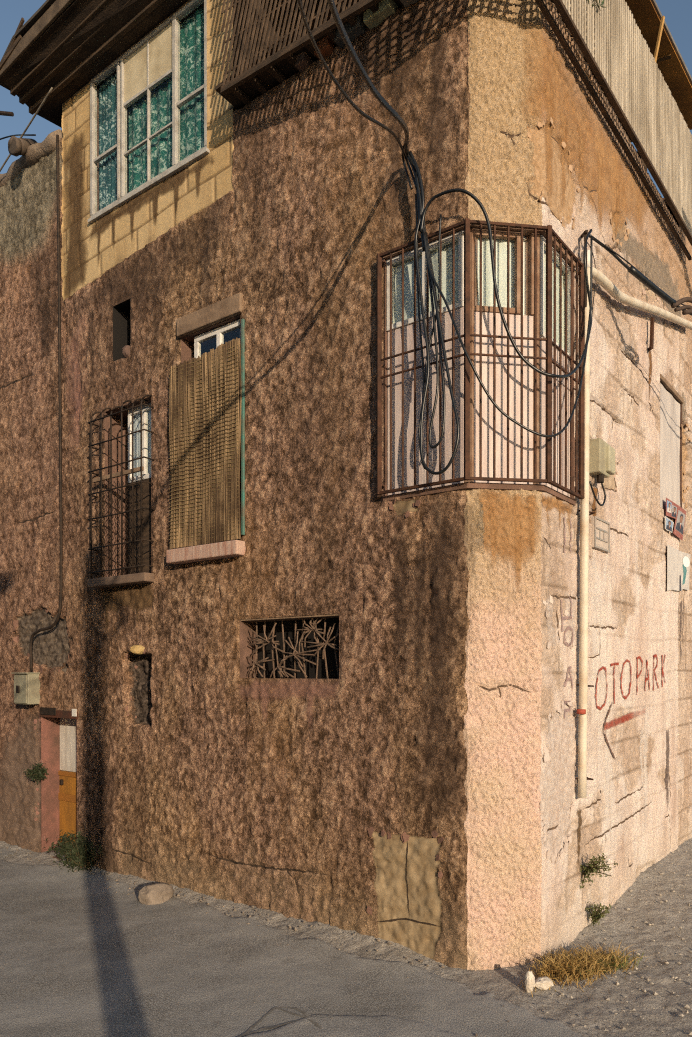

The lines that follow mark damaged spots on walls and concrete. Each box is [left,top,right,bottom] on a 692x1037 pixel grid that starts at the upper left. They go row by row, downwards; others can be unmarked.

flaking render [527,117,580,229]
crack [238,1007,322,1037]